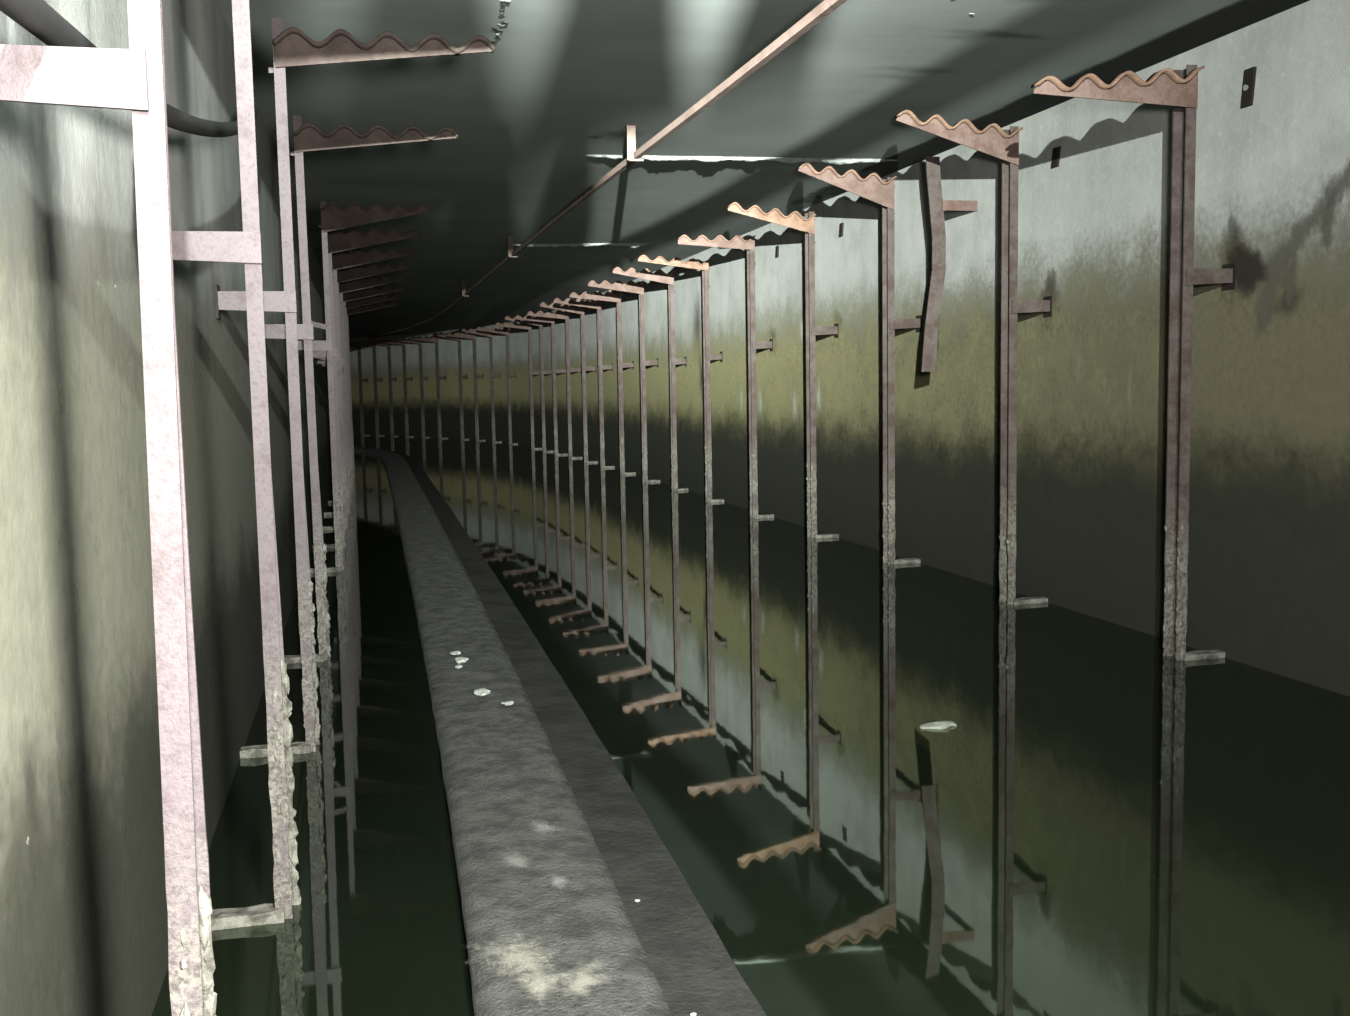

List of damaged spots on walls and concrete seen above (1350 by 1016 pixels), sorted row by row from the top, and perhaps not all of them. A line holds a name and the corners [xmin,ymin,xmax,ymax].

water stain [1259,163,1350,328]
water stain [277,444,333,633]
water stain [352,389,1000,587]
water stain [1015,445,1166,638]
water stain [1186,448,1350,697]
water stain [194,556,265,850]
water stain [0,700,169,1016]